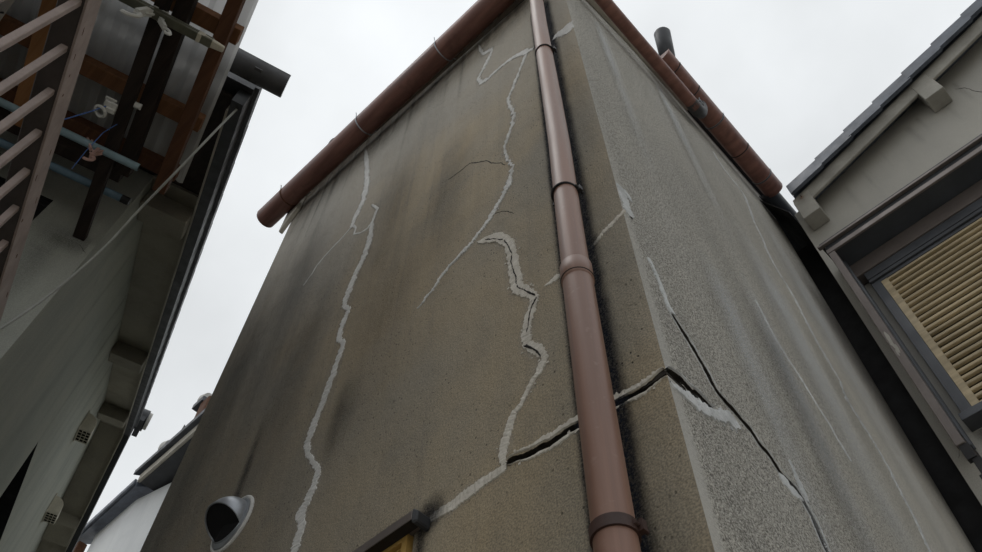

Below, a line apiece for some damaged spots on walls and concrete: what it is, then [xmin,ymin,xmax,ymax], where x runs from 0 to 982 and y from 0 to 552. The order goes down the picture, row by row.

crack [290,149,379,552]
crack [417,20,579,522]
crack [591,209,626,248]
crack [614,257,831,552]